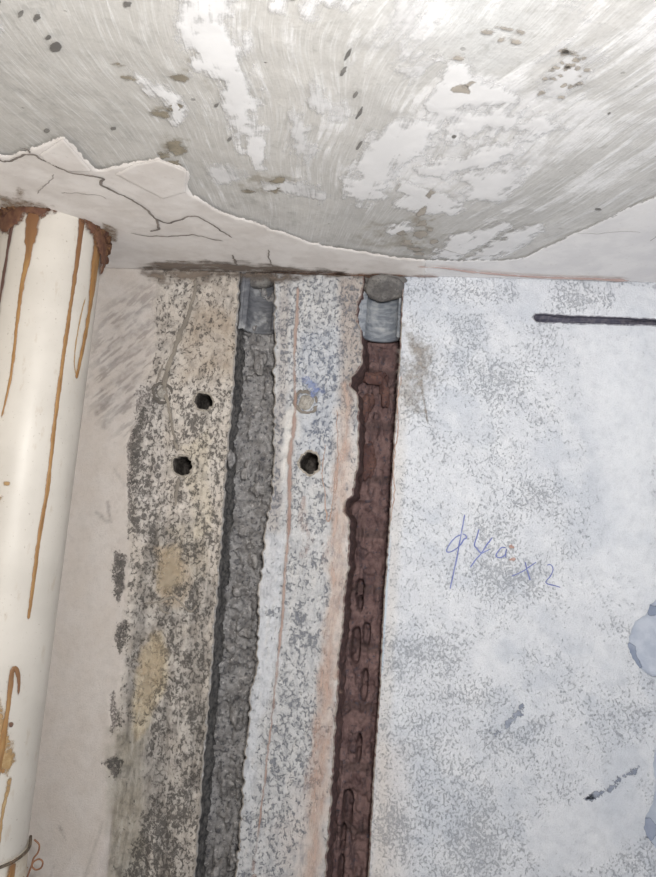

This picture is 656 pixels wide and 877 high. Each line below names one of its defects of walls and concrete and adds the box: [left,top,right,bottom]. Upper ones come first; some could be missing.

crack [0,148,238,266]
flaking render [0,0,656,282]